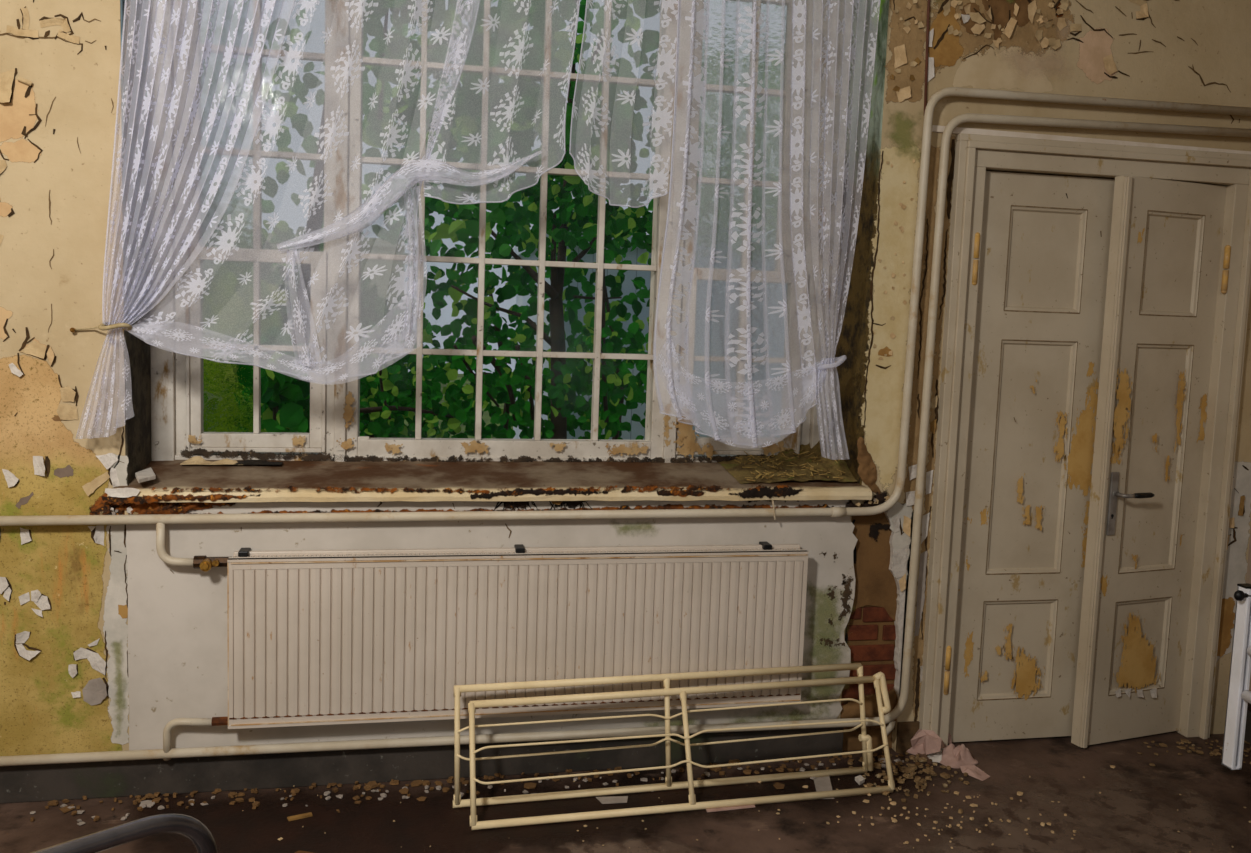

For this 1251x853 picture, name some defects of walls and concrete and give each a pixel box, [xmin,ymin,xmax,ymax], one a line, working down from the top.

crack [0,0,106,55]
peeling [885,0,1130,104]
crack [1041,0,1240,124]
peeling [0,68,43,175]
peeling [0,306,139,756]
corrosion [241,485,834,514]
peeling [840,136,956,751]
peeling [1053,362,1099,567]
peeling [1110,368,1133,465]
leakage [819,552,853,647]
peeling [995,624,1045,700]
peeling [1113,610,1161,698]